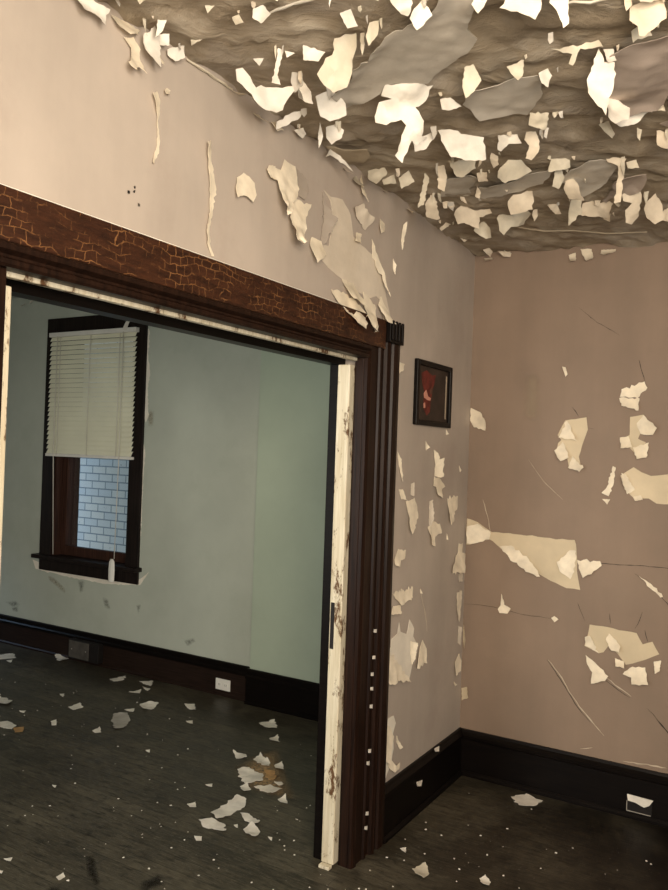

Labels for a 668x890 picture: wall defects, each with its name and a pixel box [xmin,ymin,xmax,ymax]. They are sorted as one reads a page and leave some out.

peeling [78,0,668,332]
peeling [554,407,591,472]
peeling [602,361,668,504]
peeling [398,453,418,534]
peeling [426,442,458,546]
peeling [394,549,406,567]
crack [638,576,668,604]
peeling [389,586,427,685]
crack [547,660,601,732]